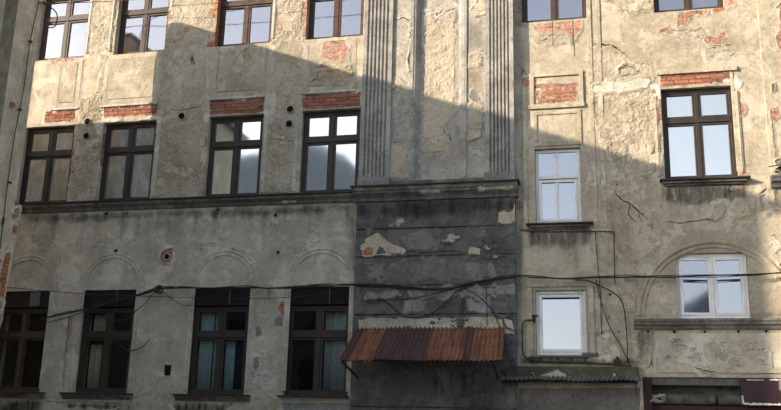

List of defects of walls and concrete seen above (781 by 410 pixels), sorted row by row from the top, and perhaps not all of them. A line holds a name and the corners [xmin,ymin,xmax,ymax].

spalling [42,0,362,202]
spalling [406,3,485,159]
flaking render [0,204,22,326]
spalling [389,141,409,181]
peeling [355,217,516,336]
spalling [513,0,739,377]
crack [614,189,773,224]
spalling [38,361,182,410]
spalling [222,349,284,410]
spalling [540,368,571,380]